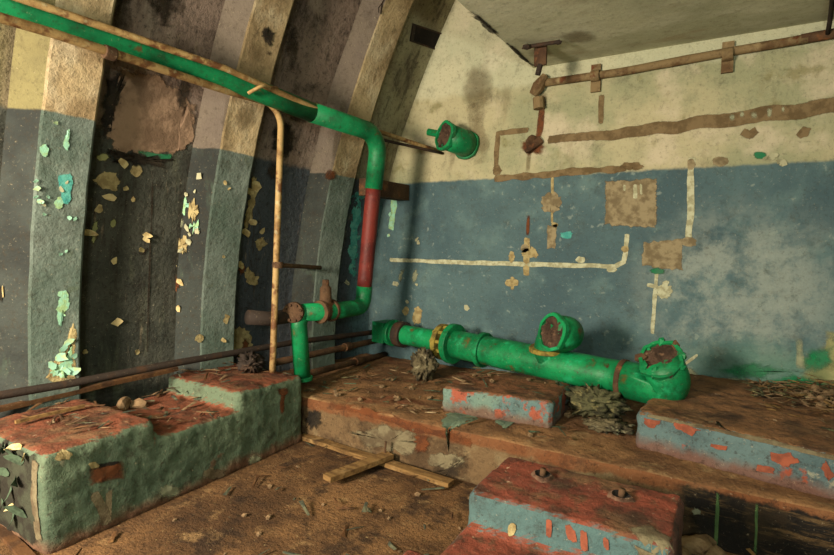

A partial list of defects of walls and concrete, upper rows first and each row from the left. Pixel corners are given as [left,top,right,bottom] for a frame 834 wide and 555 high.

leakage [113,0,132,30]
leakage [101,74,125,136]
leakage [177,80,190,107]
leakage [108,149,172,168]
flaking render [84,68,197,243]
peeling [33,173,73,216]
peeling [178,189,199,254]
flaking render [604,178,657,227]
flaking render [641,157,696,334]
peeling [724,332,834,410]
peeling [756,452,799,474]
peeling [565,524,588,551]